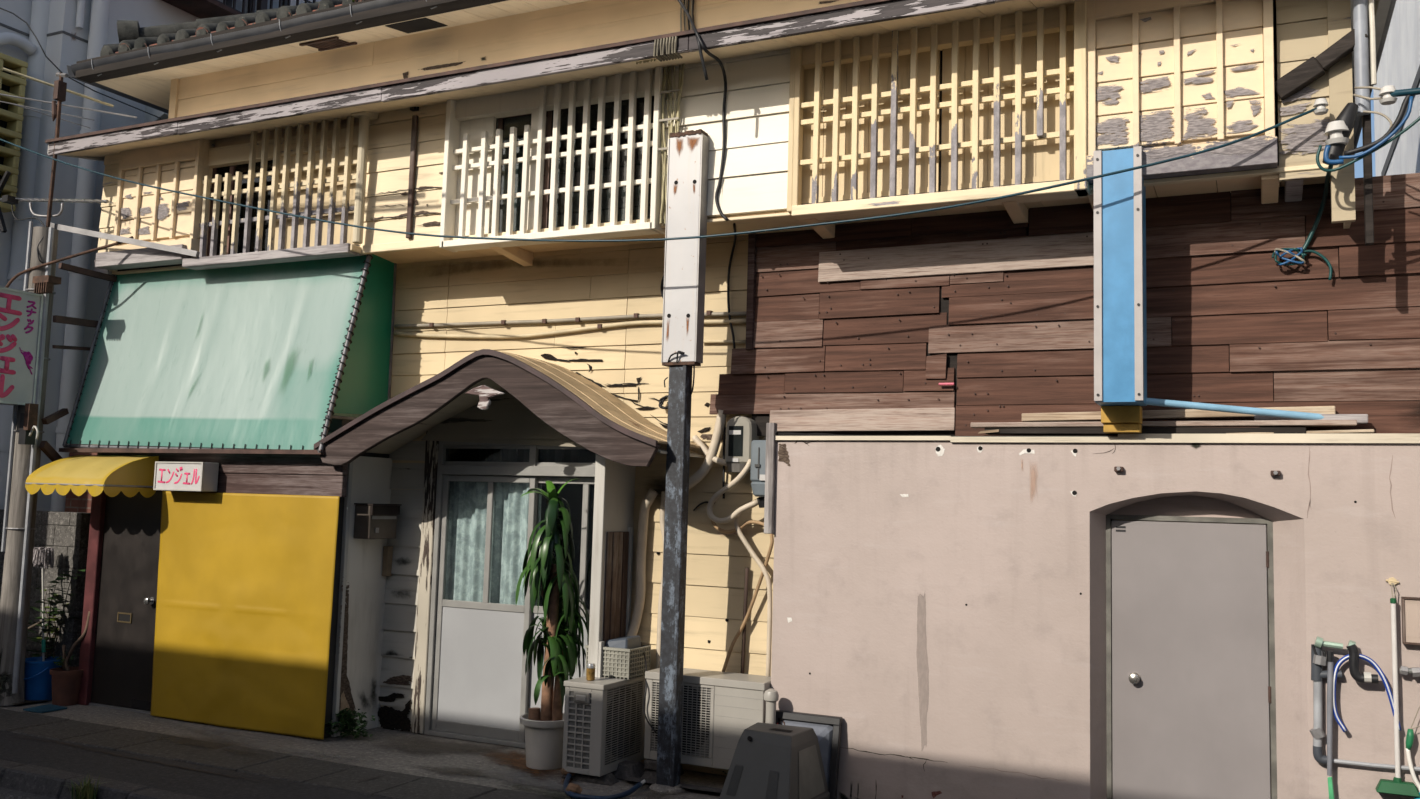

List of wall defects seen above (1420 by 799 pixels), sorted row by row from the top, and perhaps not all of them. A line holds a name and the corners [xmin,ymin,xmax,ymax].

peeling [403,61,466,79]
peeling [1096,43,1330,162]
corrosion [677,138,698,153]
peeling [120,192,189,235]
crack [840,747,1057,799]